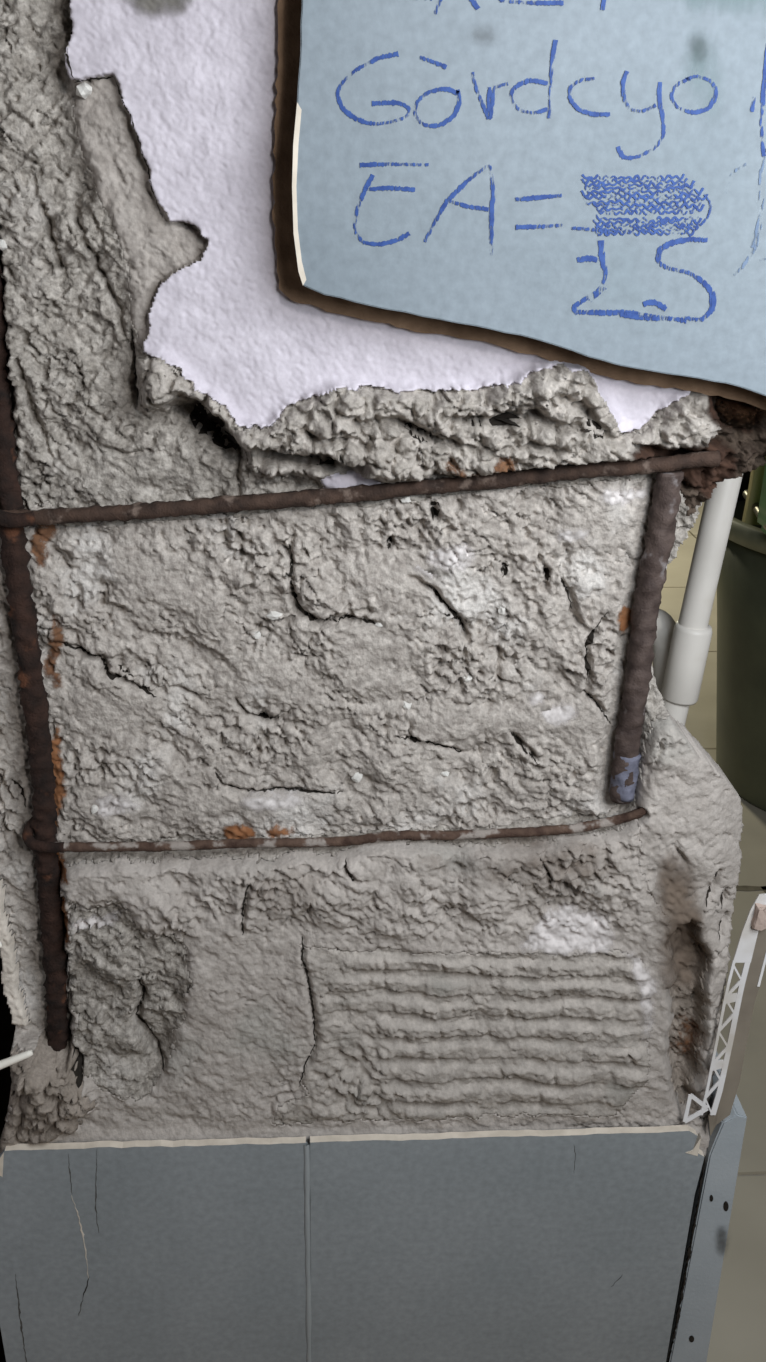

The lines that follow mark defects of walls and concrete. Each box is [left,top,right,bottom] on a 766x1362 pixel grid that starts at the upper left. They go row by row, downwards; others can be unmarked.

rust [30,525,57,567]
rust [43,614,64,688]
crack [289,544,376,624]
spalling [0,0,744,1120]
crack [429,585,464,630]
rust [618,606,631,632]
rust [51,728,67,826]
crack [216,773,343,794]
rust [224,824,293,839]
rust [57,852,69,943]
crack [299,937,316,1085]
crack [68,1155,99,1315]